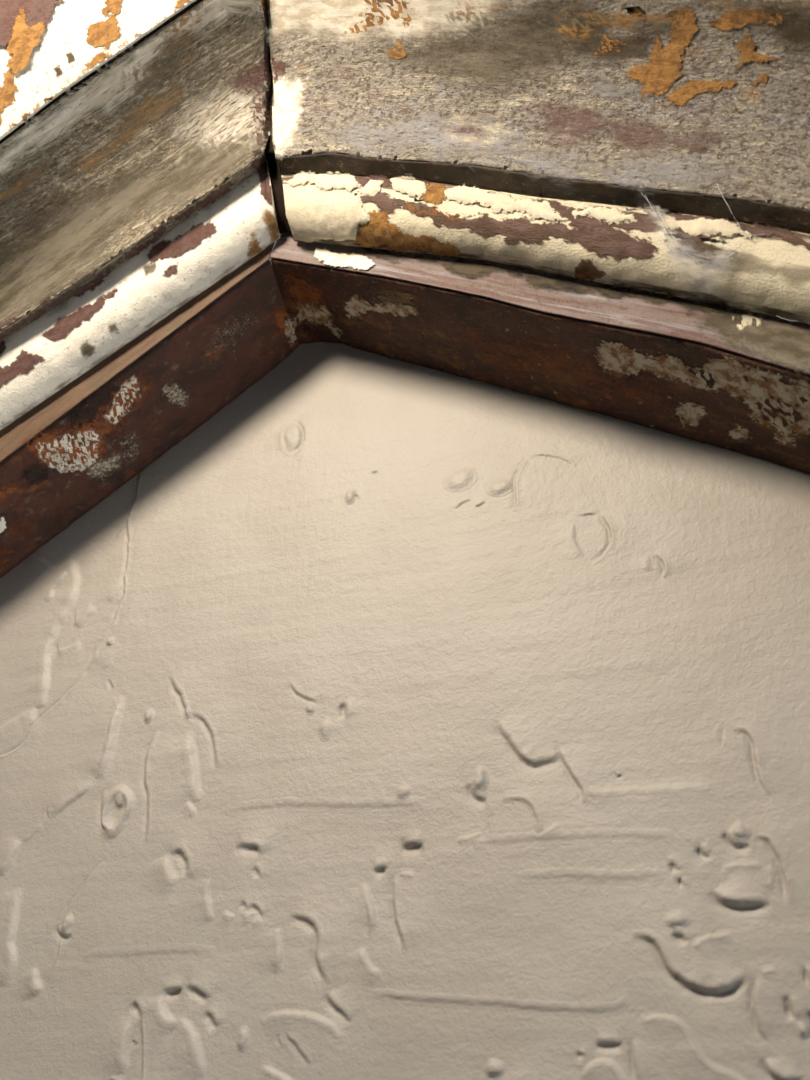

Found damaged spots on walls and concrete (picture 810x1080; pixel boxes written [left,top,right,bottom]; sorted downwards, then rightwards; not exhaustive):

peeling [0,0,191,131]
peeling [245,154,273,206]
peeling [283,171,810,281]
peeling [0,182,235,388]
rust [274,275,342,347]
peeling [732,311,762,330]
rust [0,375,148,499]
peeling [87,432,138,478]
peeling [595,340,810,449]